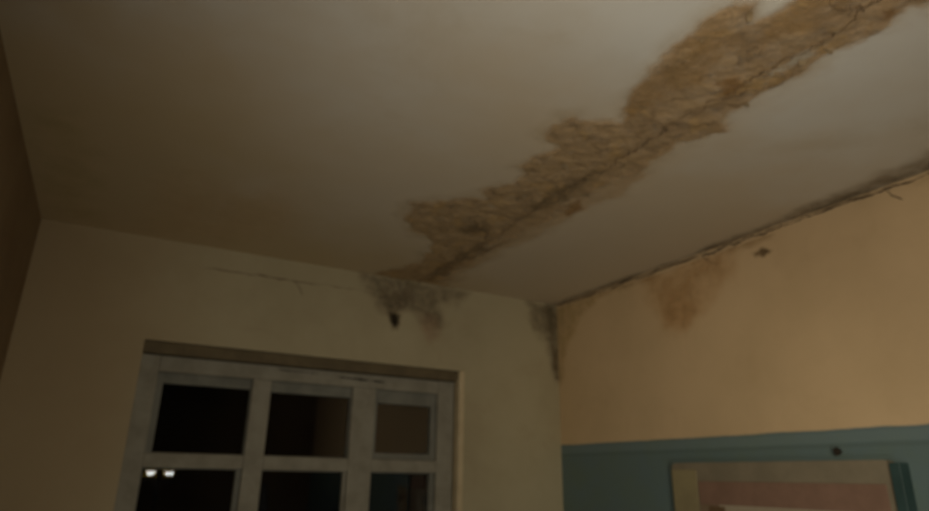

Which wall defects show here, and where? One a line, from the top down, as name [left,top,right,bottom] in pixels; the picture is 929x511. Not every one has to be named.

leakage [373,0,928,327]
crack [558,173,929,306]